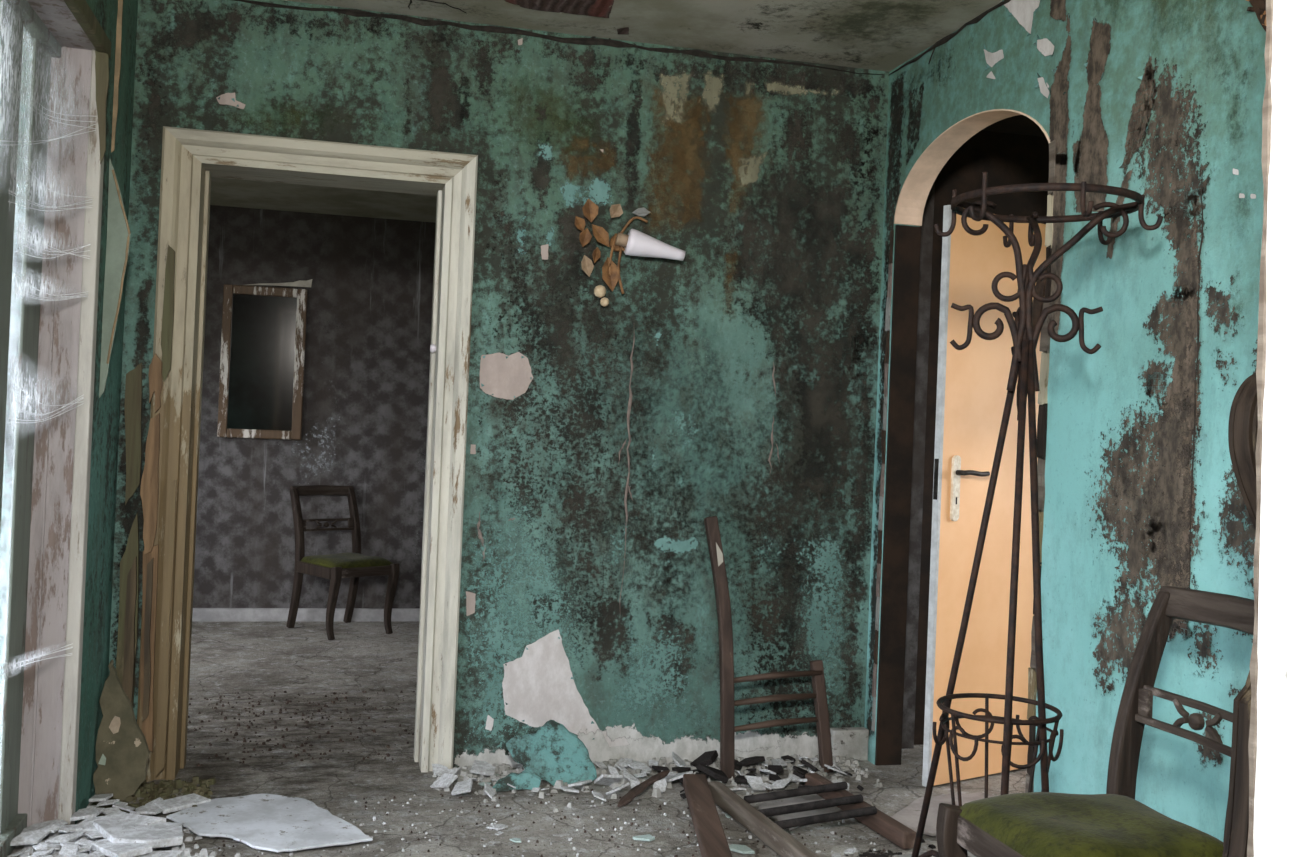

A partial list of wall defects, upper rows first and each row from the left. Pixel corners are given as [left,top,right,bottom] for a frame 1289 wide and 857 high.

damp [136,0,521,172]
flaking render [505,0,629,35]
flaking render [984,44,1005,79]
flaking render [541,227,555,260]
flaking render [479,352,534,400]
damp [478,41,950,736]
peeling [1002,0,1257,696]
damp [117,276,154,722]
flaking render [454,495,819,768]
peeling [762,527,855,721]
peeling [1195,712,1225,767]